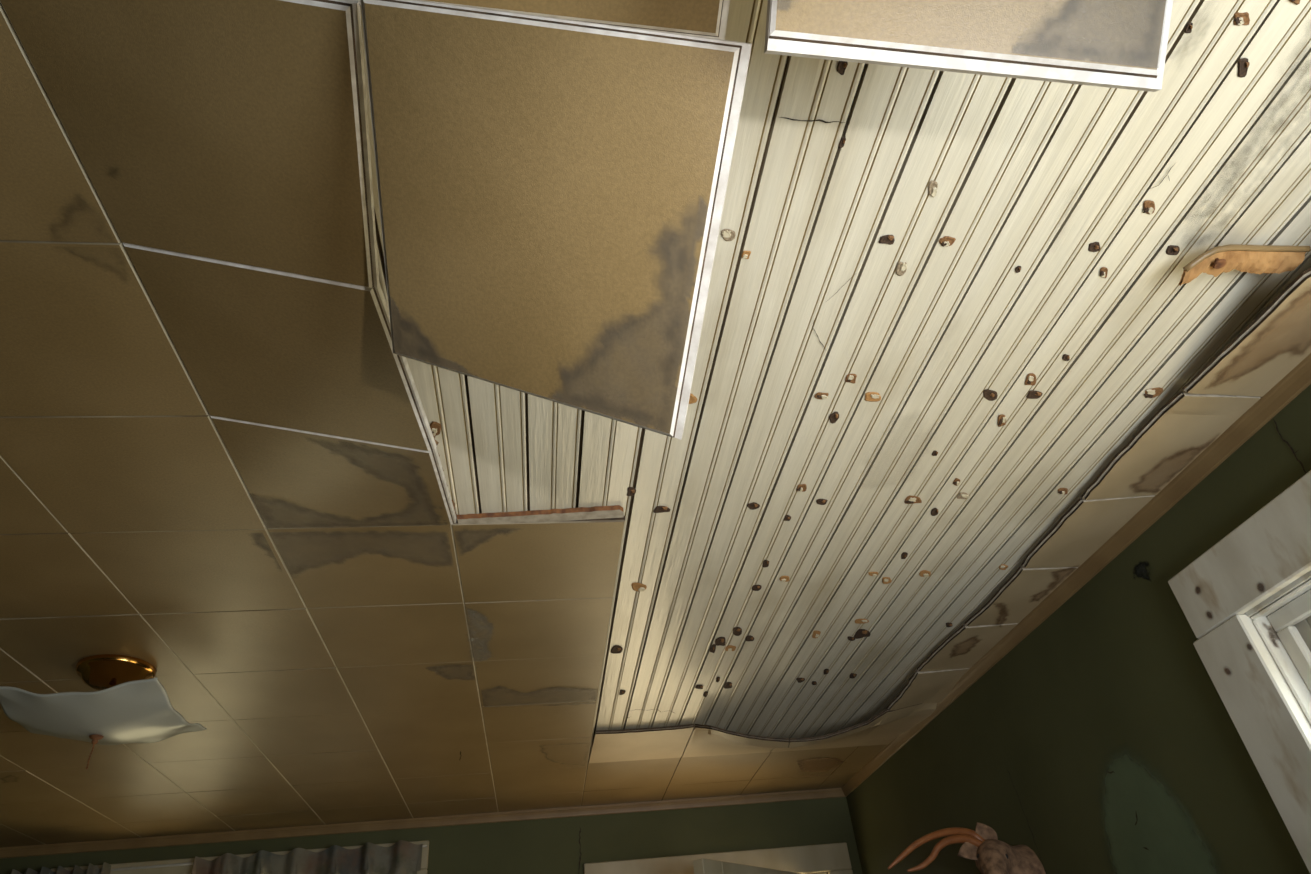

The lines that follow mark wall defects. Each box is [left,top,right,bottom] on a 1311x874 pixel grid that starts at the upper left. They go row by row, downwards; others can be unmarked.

spalling [429,421,442,436]